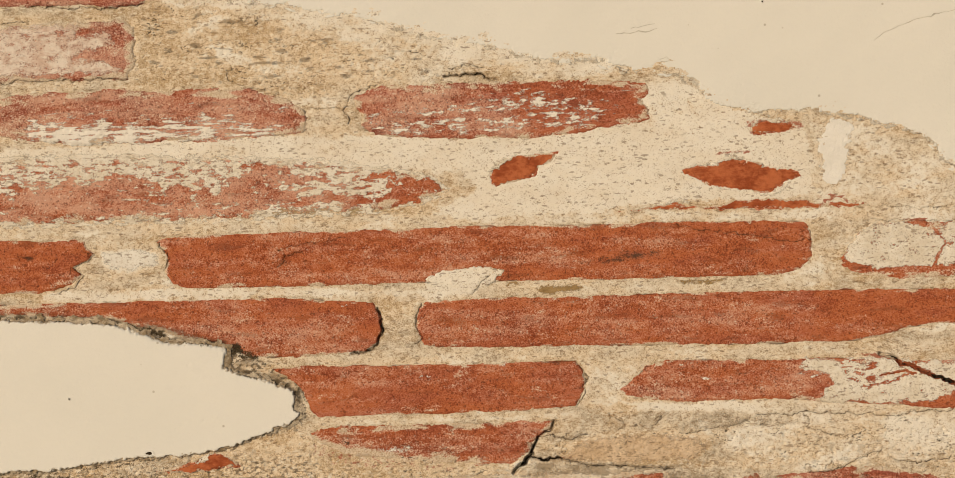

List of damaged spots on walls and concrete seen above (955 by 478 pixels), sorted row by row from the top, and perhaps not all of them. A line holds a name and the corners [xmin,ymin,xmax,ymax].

peeling [0,24,120,80]
peeling [368,88,618,135]
spalling [742,102,793,134]
peeling [0,103,450,230]
spalling [488,153,555,185]
spalling [684,154,820,210]
peeling [844,221,955,270]
spalling [1,313,306,478]
peeling [799,356,955,404]
crack [882,354,953,383]
crack [515,422,675,471]
crack [652,409,955,473]